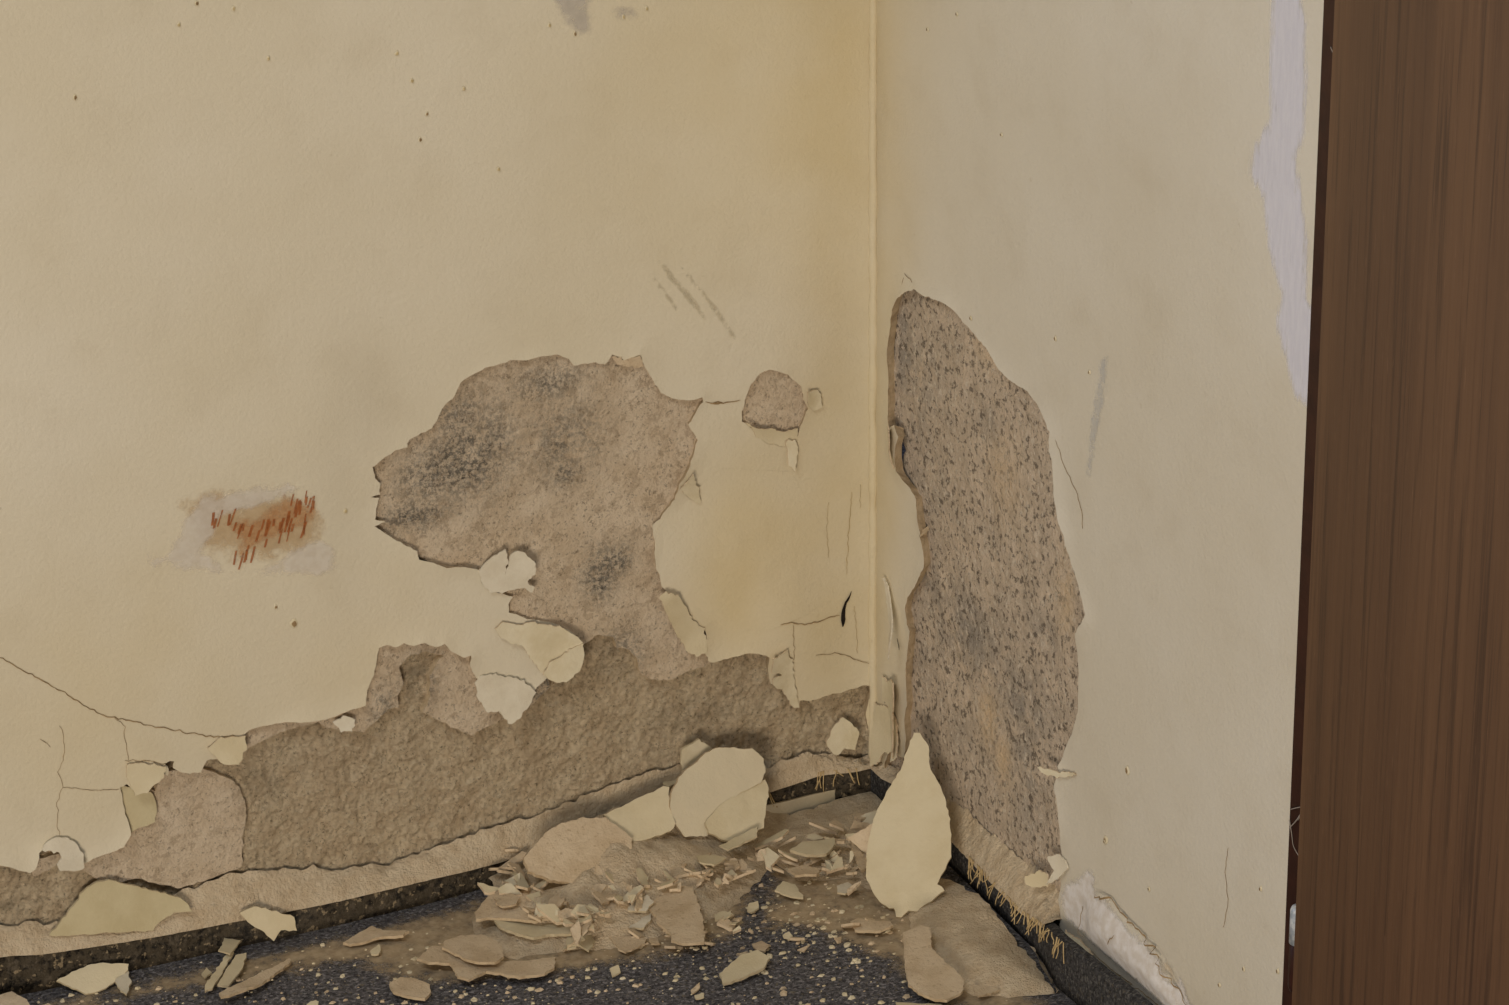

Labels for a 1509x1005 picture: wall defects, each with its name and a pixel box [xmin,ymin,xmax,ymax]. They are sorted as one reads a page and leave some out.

rust [199,491,315,570]
spalling [0,289,1190,1005]
crack [2,658,234,835]